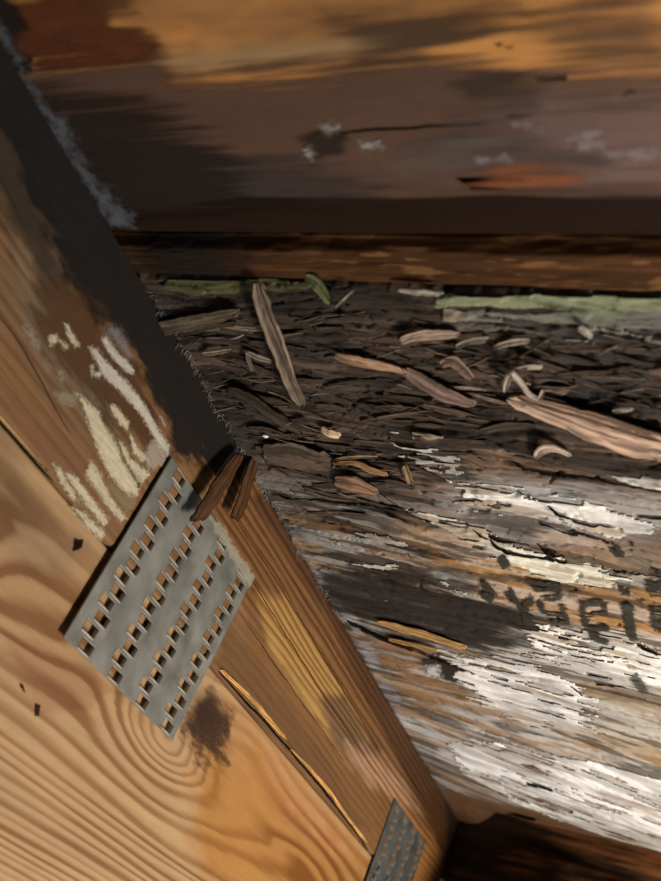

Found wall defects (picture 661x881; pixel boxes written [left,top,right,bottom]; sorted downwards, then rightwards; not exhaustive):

leakage [0,0,661,540]
crack [0,421,54,483]
crack [223,503,422,796]
crack [347,620,486,674]
peeling [500,650,572,667]
leakage [181,691,230,766]
crack [219,672,368,851]